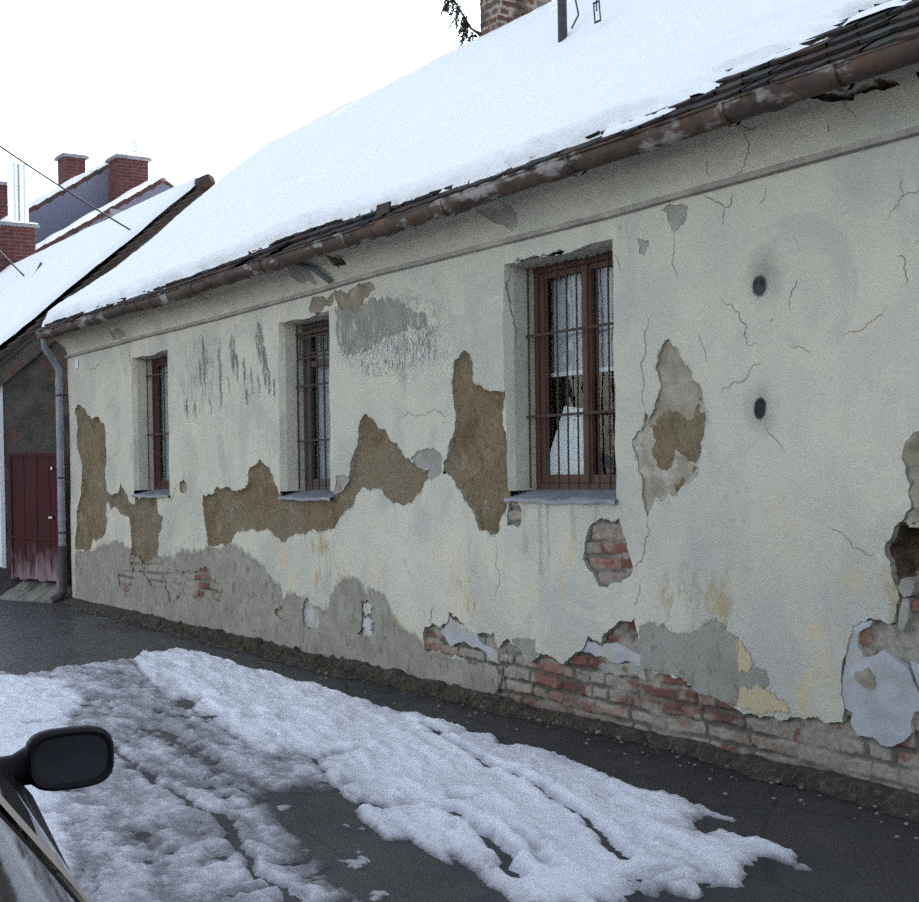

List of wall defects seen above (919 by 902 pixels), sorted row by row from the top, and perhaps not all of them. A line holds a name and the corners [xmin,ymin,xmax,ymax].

water stain [185,324,275,433]
spalling [286,265,318,285]
peeling [309,282,440,375]
flaking render [74,338,919,794]